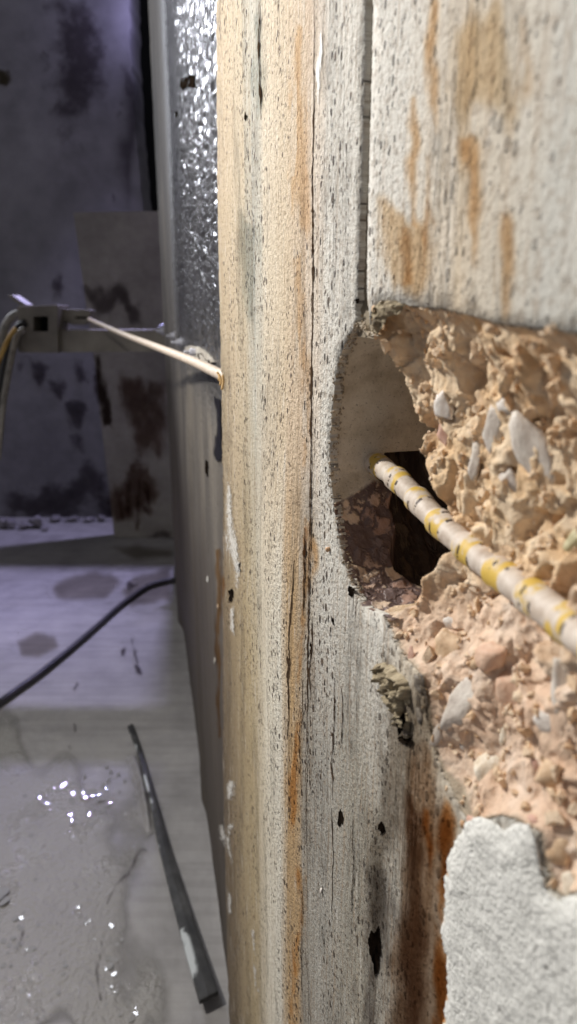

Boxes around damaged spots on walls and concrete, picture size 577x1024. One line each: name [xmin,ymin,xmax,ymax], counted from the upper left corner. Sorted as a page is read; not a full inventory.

crack [286,4,354,1020]
spalling [371,300,577,612]
spalling [370,552,577,896]
rust [401,888,420,1024]